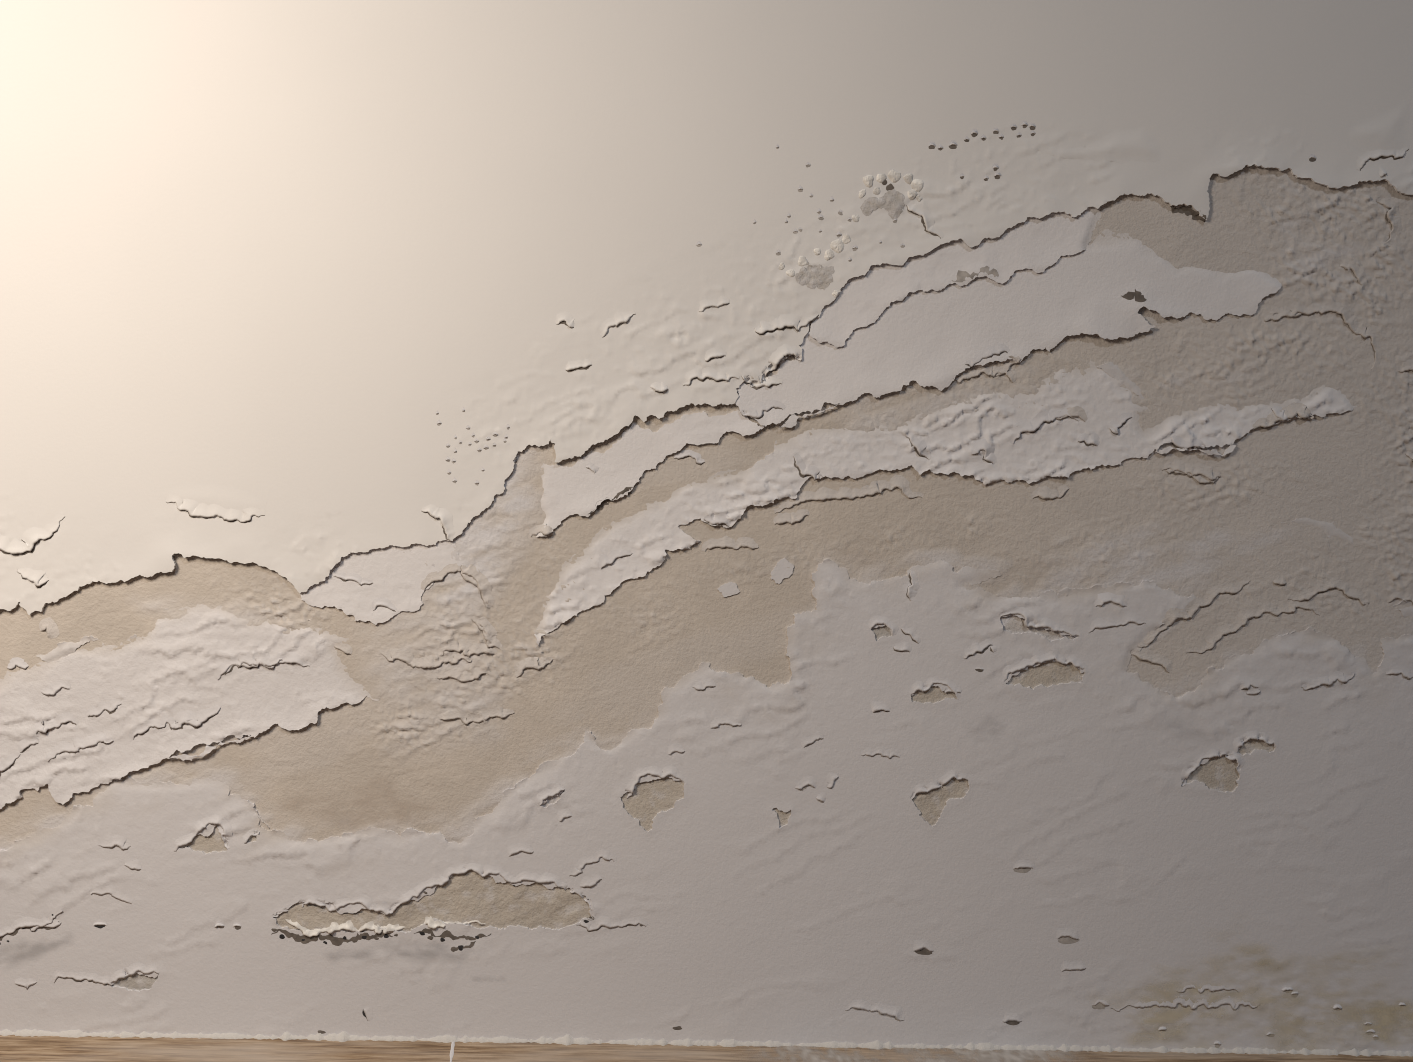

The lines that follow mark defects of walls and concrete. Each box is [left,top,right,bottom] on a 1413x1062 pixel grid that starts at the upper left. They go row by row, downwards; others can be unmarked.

spalling [928,121,1036,151]
flaking render [0,154,1413,854]
spalling [1012,859,1035,873]
flaking render [271,863,596,952]
spalling [214,921,242,930]
spalling [1055,928,1079,944]
spalling [913,939,934,955]
flaking render [110,962,160,991]
spalling [1003,1012,1022,1025]